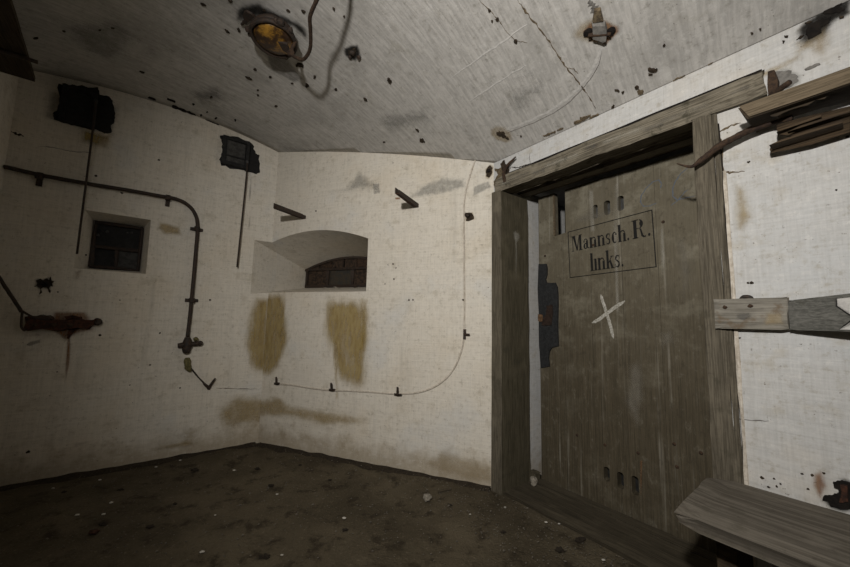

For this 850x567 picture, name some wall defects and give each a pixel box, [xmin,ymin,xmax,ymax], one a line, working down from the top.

crack [480,1,595,107]
peeling [782,1,849,44]
water stain [249,297,285,372]
water stain [327,304,365,382]
water stain [224,400,345,422]